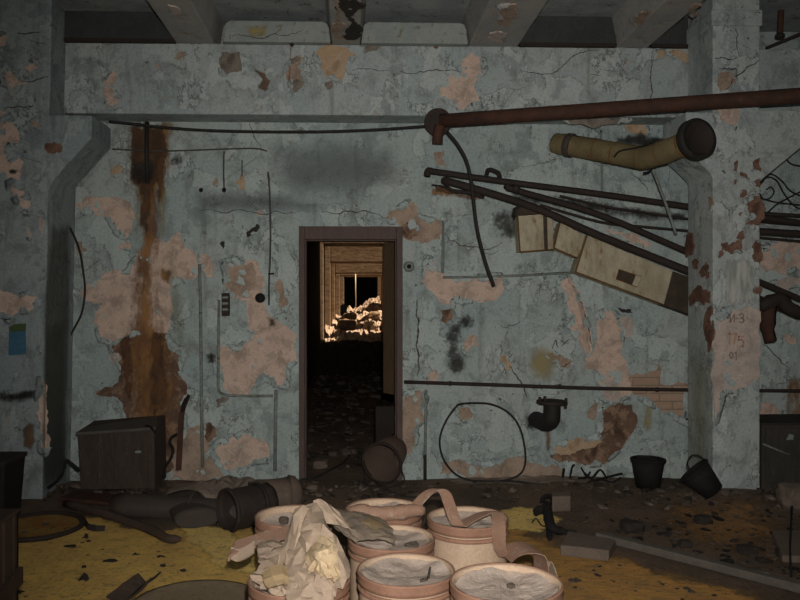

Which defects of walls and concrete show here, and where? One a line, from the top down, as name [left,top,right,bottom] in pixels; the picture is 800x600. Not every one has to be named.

peeling [283,0,381,93]
crack [356,67,460,75]
peeling [439,53,489,112]
crack [521,50,592,75]
peeling [0,110,45,241]
peeling [386,198,442,243]
peeling [0,289,43,324]
corrosion [121,122,173,417]
peeling [72,196,298,481]
peeling [421,255,504,325]
peeling [684,232,761,429]
flaking render [440,308,688,478]